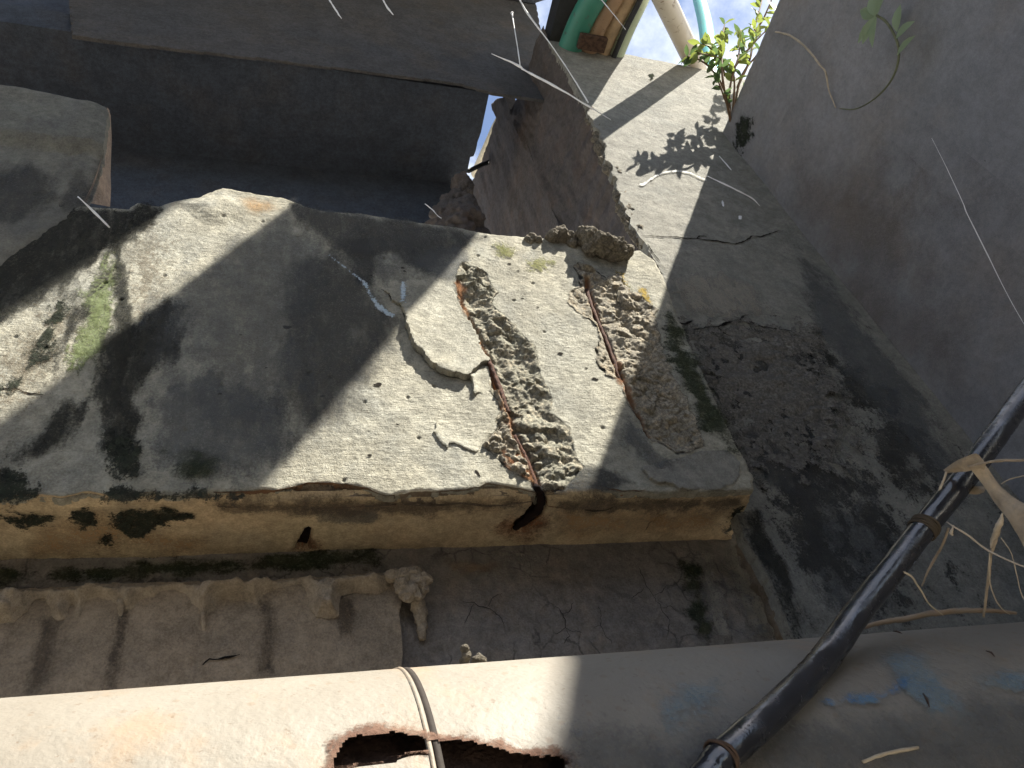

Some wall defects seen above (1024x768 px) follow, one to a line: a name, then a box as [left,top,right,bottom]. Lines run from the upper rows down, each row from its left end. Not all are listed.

spalling [584,106,646,250]
crack [641,230,779,261]
damp [732,116,754,157]
damp [0,164,472,686]
spalling [214,263,583,531]
spalling [567,262,704,453]
damp [726,506,812,635]
rust [322,721,581,768]